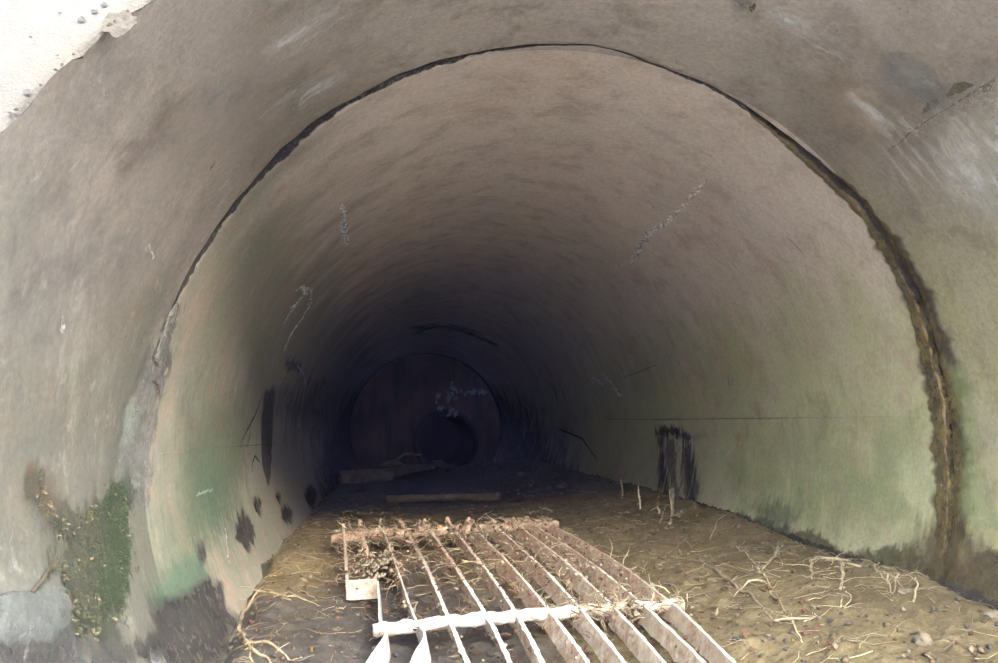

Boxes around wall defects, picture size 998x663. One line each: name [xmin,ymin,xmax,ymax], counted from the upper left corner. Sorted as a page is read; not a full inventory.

crack [888,72,998,151]
spalling [115,302,180,509]
leakage [0,541,242,663]